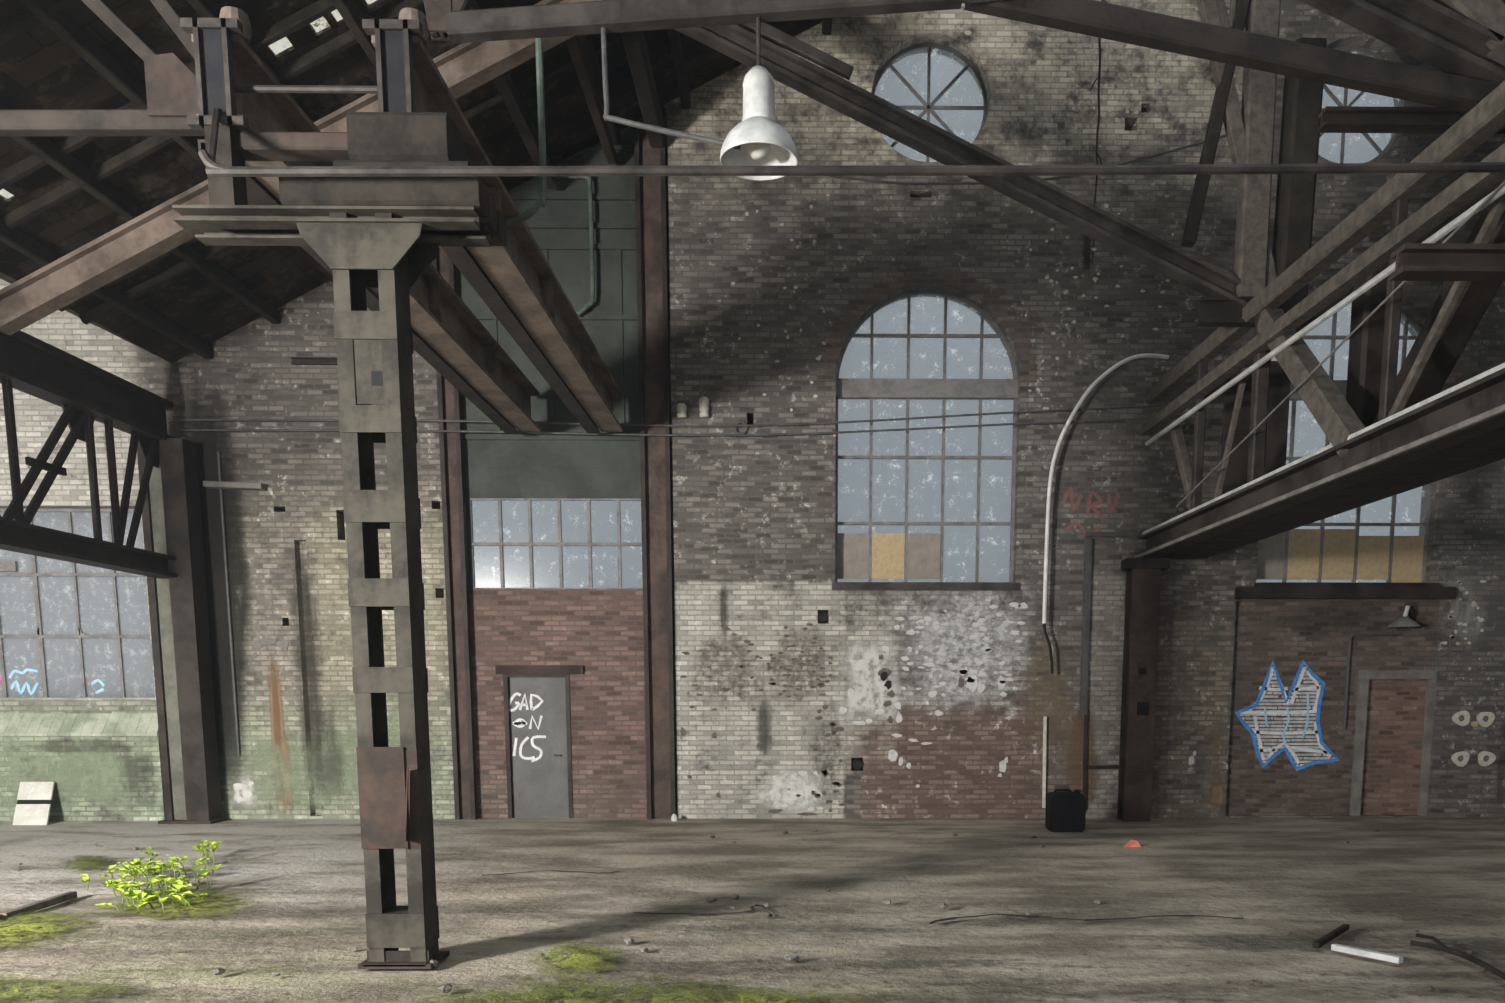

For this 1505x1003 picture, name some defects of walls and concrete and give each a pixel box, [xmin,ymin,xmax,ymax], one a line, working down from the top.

peeling [722,594,1028,816]